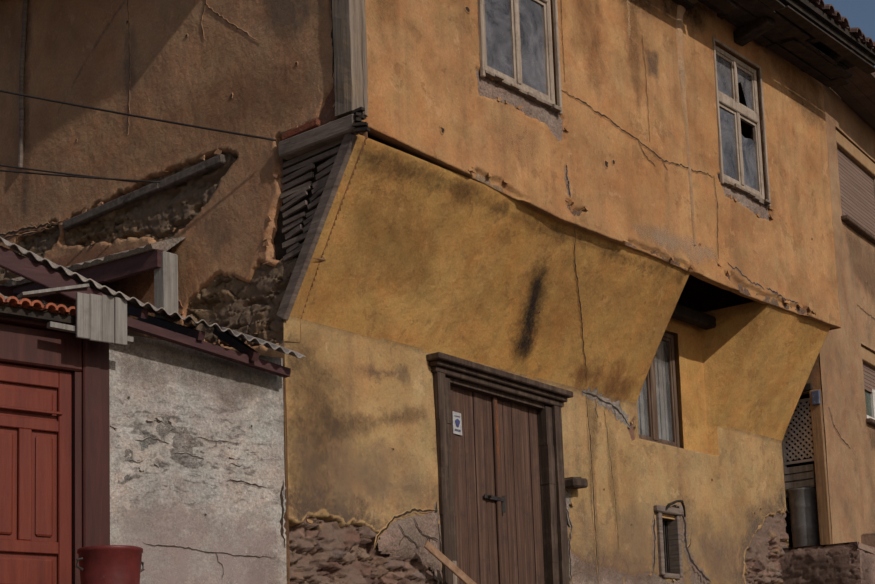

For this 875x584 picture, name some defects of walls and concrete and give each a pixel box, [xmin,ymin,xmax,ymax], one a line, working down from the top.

spalling [476,69,569,141]
crack [560,0,798,304]
spalling [718,262,816,316]
crack [566,229,631,584]
crack [145,479,286,580]
crack [673,504,711,584]